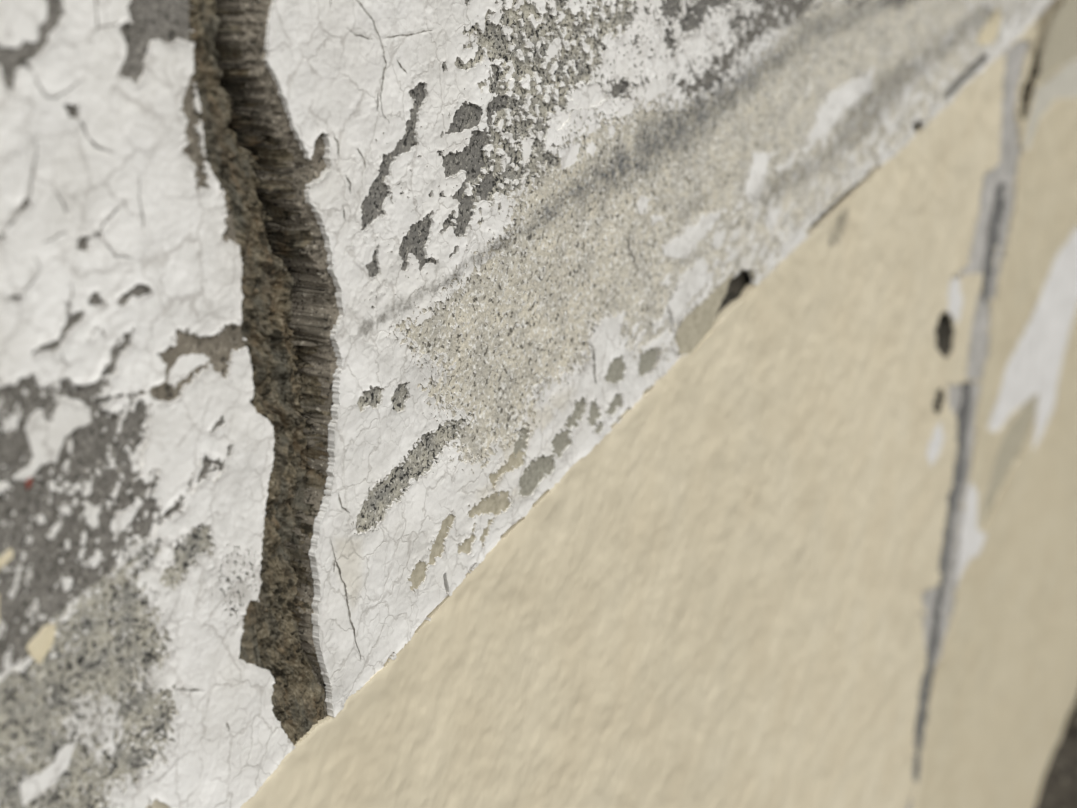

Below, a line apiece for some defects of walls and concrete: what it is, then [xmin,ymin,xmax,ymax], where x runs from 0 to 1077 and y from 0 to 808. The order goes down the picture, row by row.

peeling [0,0,64,89]
peeling [118,0,190,83]
peeling [64,104,77,118]
peeling [77,231,100,251]
peeling [351,0,1077,554]
crack [186,0,366,745]
crack [907,40,1041,808]
peeling [0,324,245,808]
peeling [407,514,455,591]